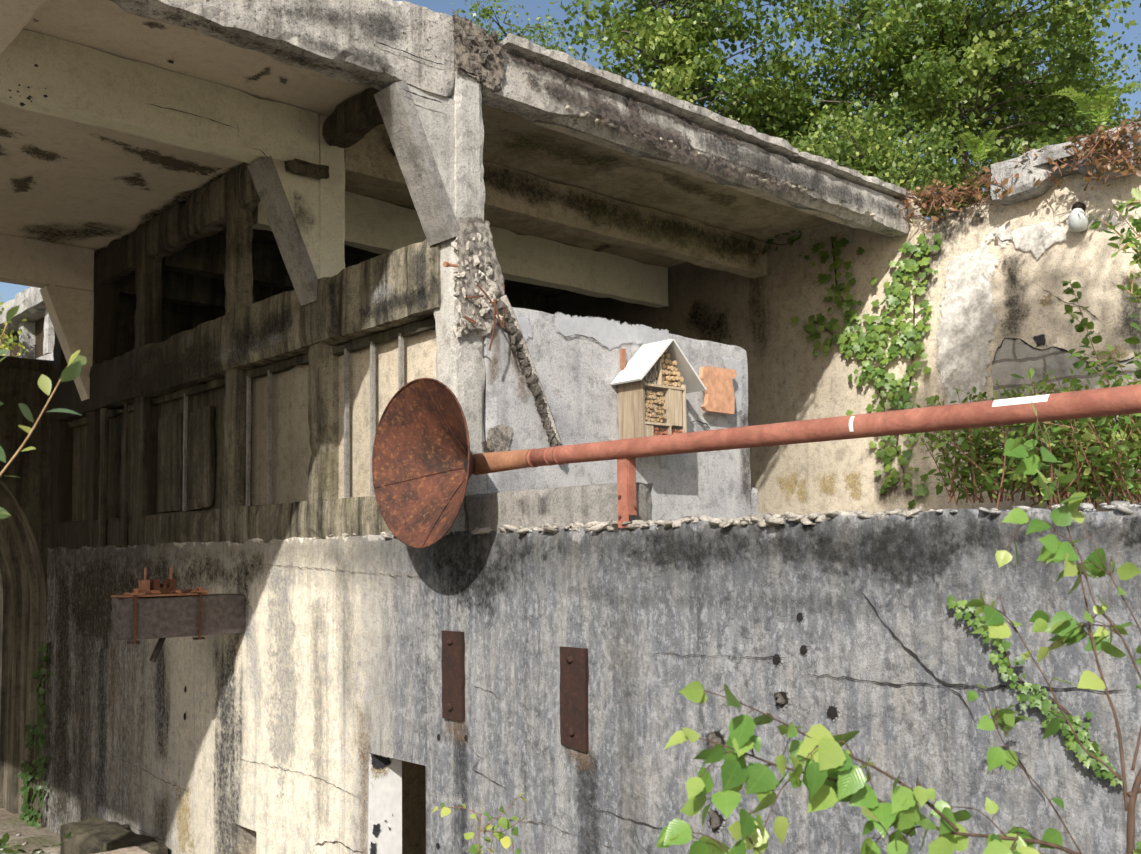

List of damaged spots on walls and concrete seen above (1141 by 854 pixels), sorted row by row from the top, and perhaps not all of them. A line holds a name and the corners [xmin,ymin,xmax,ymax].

leakage [493,46,900,218]
leakage [25,223,121,244]
leakage [483,167,761,265]
spalling [451,217,532,351]
peeling [554,312,669,350]
peeling [936,221,1141,405]
peeling [722,356,744,413]
leakage [433,541,532,614]
leakage [53,552,297,854]
crack [656,652,784,660]
crack [808,593,1127,726]